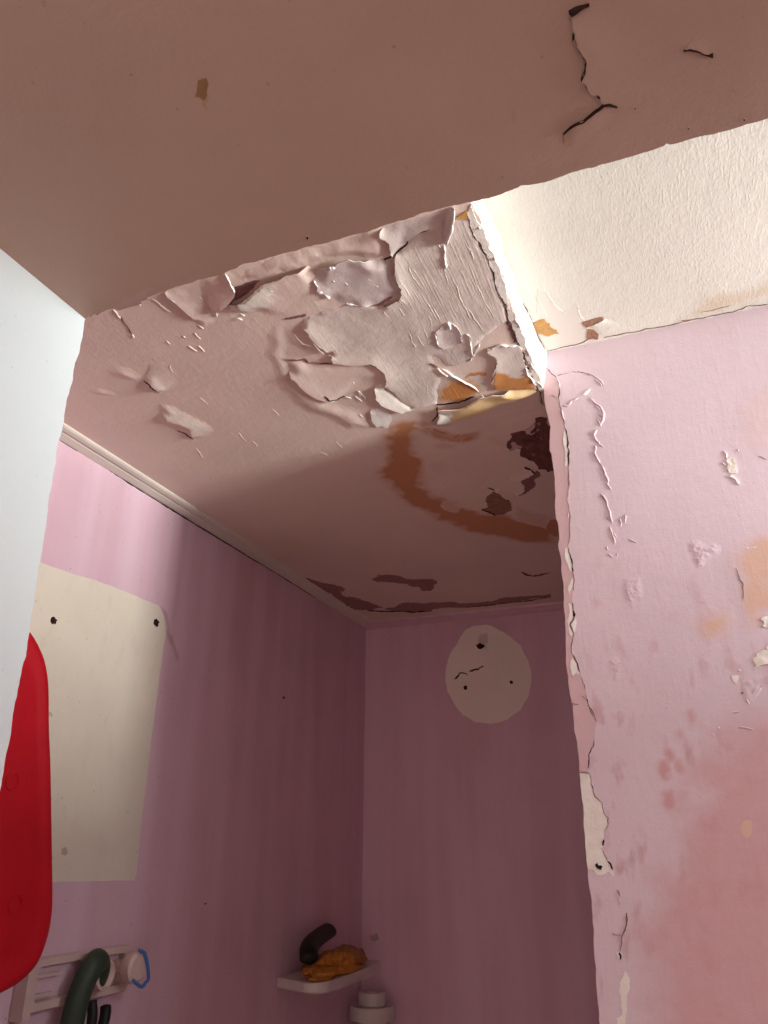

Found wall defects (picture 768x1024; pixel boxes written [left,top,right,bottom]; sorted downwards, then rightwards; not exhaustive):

crack [683,38,714,58]
crack [561,104,617,154]
peeling [153,205,620,429]
peeling [141,362,214,440]
leakage [366,390,559,547]
flaking render [481,417,568,516]
peeling [560,370,627,558]
crack [467,217,768,772]
peeling [722,449,740,485]
peeling [306,574,551,613]
spalling [565,547,576,637]
flaking render [580,772,614,876]